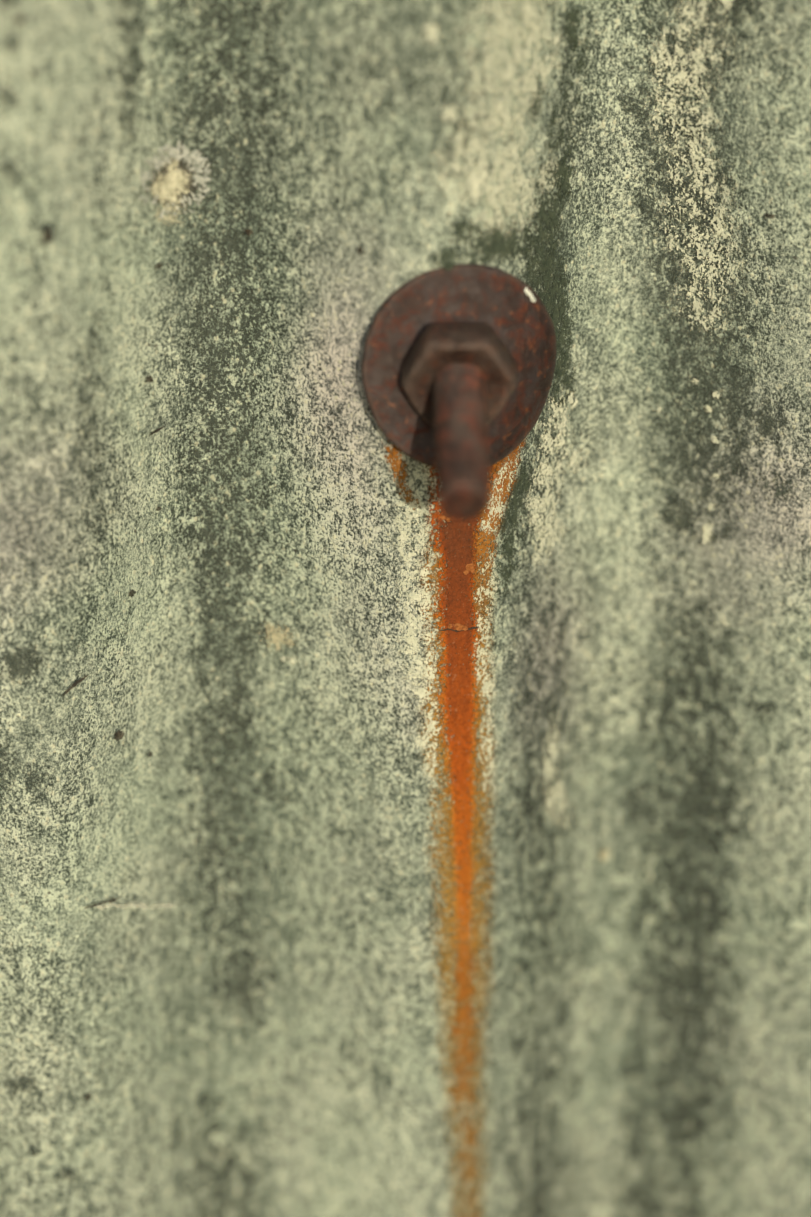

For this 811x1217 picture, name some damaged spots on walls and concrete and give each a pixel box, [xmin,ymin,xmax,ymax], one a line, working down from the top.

corrosion [382,438,535,1217]